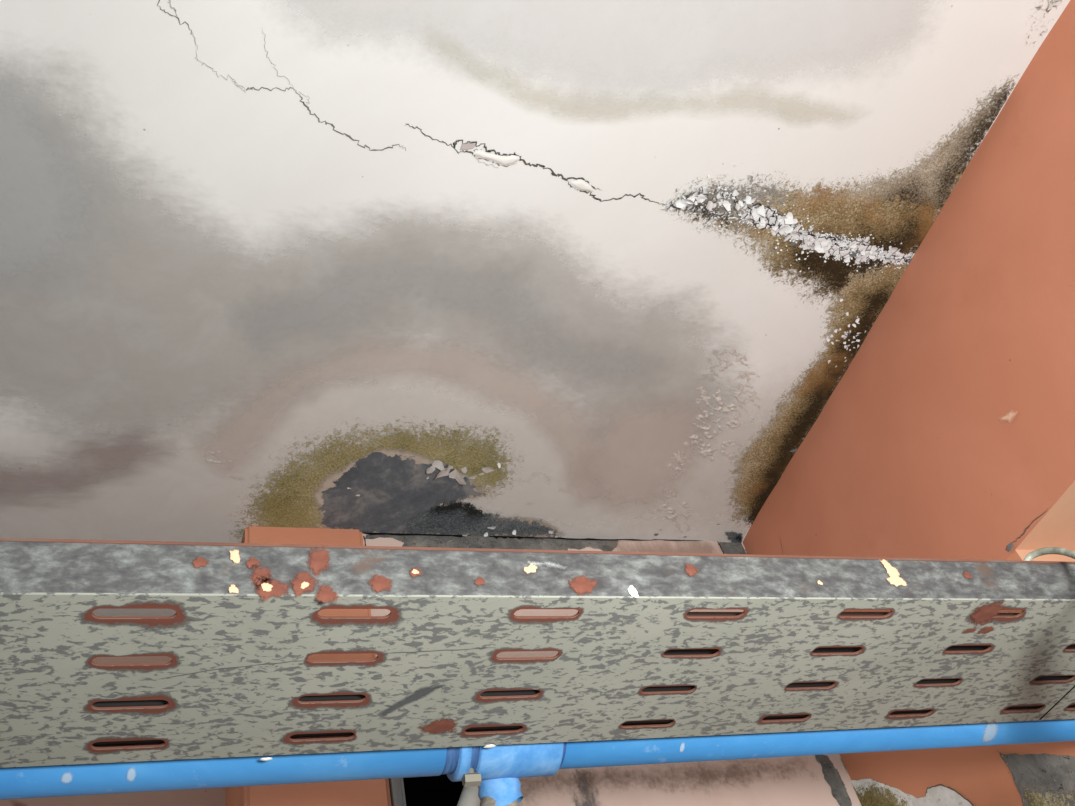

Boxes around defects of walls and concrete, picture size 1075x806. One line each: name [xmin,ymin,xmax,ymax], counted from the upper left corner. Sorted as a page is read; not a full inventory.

crack [157,0,665,205]
water stain [663,74,1019,543]
spalling [314,449,618,551]
corrosion [192,557,208,568]
corrosion [246,547,404,628]
corrosion [508,575,598,625]
corrosion [942,600,1027,655]
corrosion [418,719,528,738]
peeling [815,755,973,806]